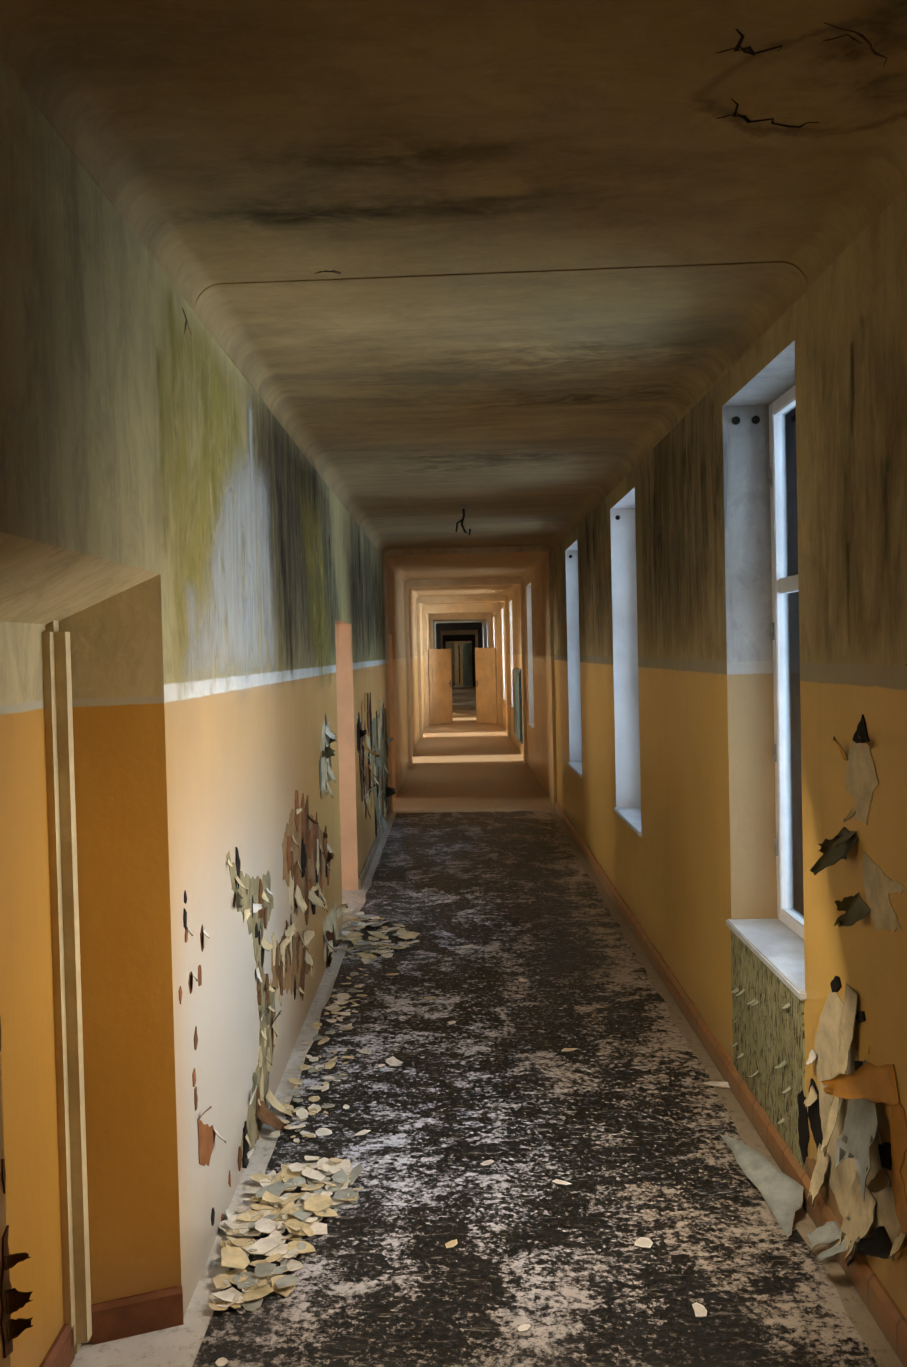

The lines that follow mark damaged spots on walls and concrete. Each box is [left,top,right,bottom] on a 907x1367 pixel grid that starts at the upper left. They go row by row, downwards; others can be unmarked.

water stain [158,311,382,663]
peeling [179,890,210,1004]
peeling [192,713,348,1187]
peeling [357,692,396,837]
peeling [731,930,907,1267]
peeling [810,714,907,932]